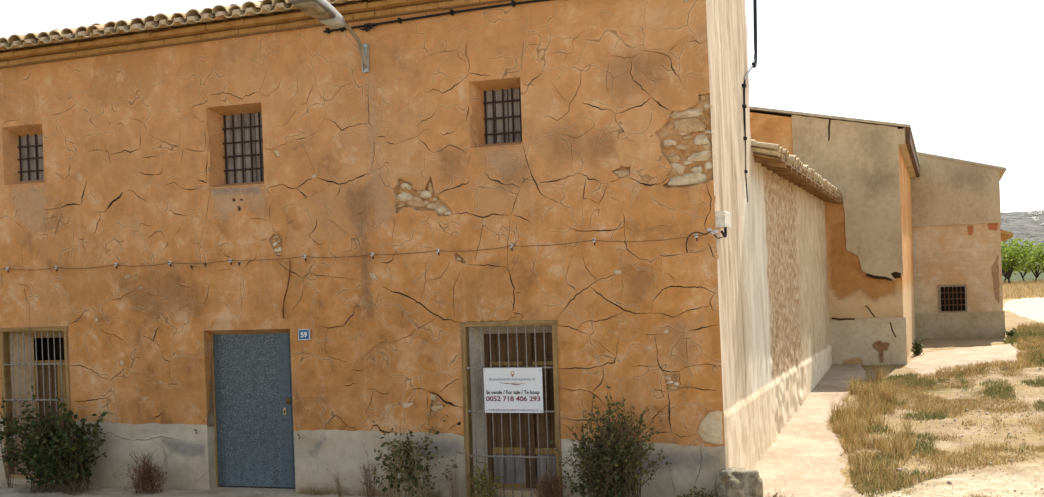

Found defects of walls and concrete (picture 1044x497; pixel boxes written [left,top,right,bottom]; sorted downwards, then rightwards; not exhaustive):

spalling [656,94,715,188]
spalling [395,179,453,216]
crack [0,20,720,497]
peeling [831,224,901,298]